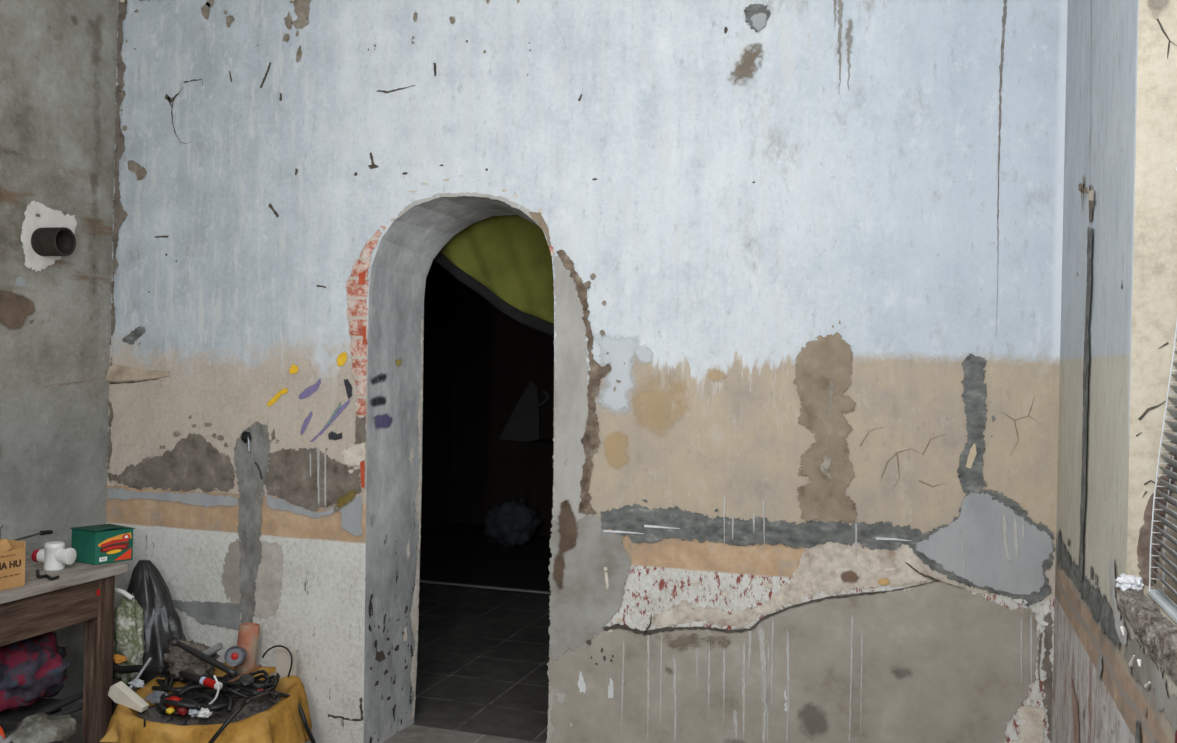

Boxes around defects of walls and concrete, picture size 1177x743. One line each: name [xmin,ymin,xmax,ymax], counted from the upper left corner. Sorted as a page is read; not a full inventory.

flaking render [201,0,235,27]
flaking render [283,0,312,62]
damp [731,44,762,83]
damp [834,0,852,90]
flaking render [110,0,150,366]
flaking render [0,290,35,329]
flaking render [346,164,626,516]
flaking render [107,390,235,493]
flaking render [264,429,366,511]
flaking render [546,541,1050,743]
flaking render [1120,626,1177,686]